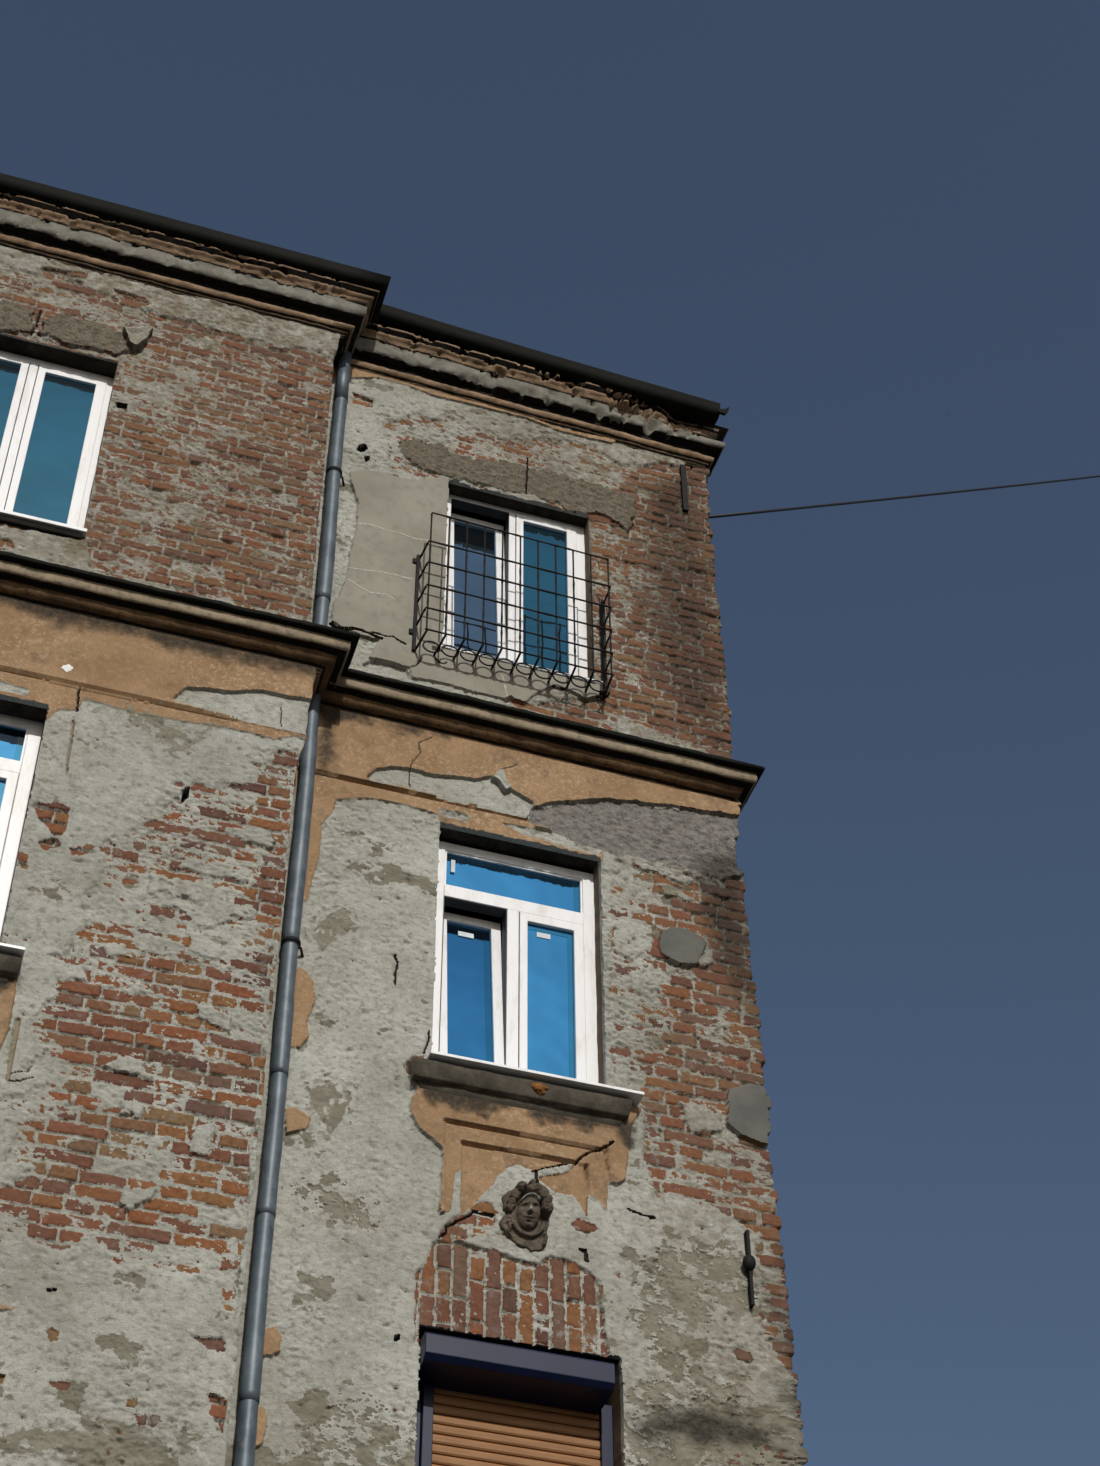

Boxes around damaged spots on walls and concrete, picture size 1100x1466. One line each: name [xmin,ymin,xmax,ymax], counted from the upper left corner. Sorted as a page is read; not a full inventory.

flaking render [0,263,359,621]
flaking render [352,392,732,759]
flaking render [0,680,30,696]
flaking render [126,686,310,756]
peeling [305,905,358,958]
flaking render [0,749,298,1320]
peeling [304,1072,359,1141]
flaking render [367,766,808,1466]
crack [531,1140,615,1183]
peeling [281,1177,380,1243]
flaking render [47,1328,59,1342]
flaking render [194,1336,225,1353]